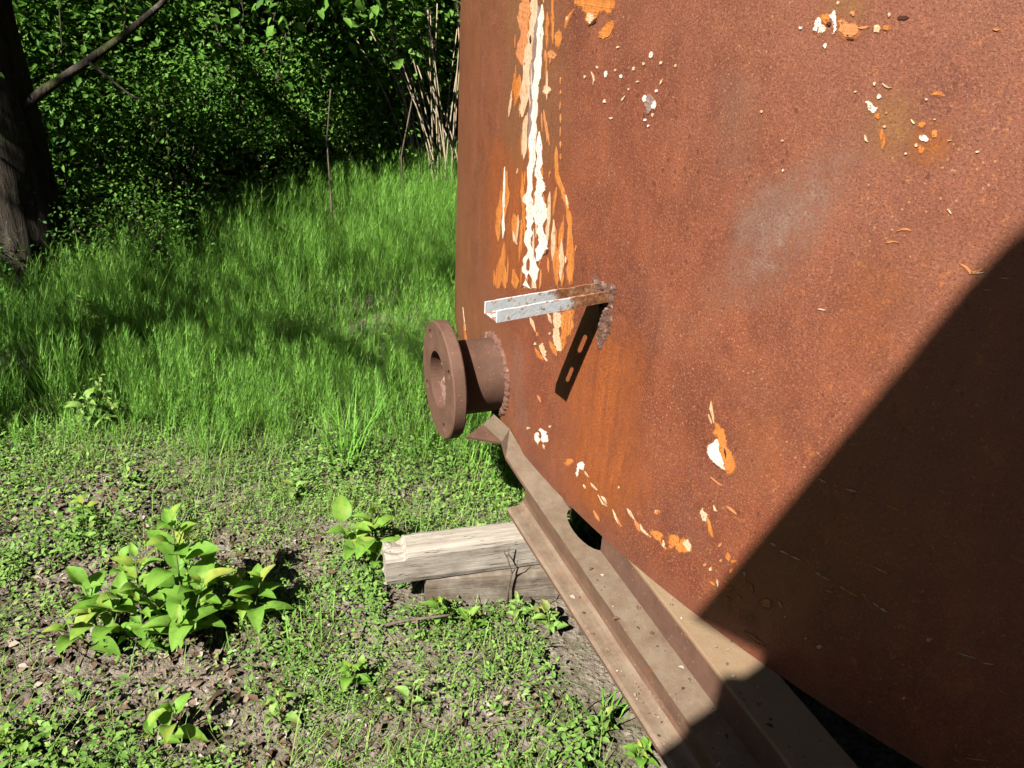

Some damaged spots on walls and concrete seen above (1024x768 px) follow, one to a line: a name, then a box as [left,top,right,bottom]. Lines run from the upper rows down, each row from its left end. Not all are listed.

peeling [798,1,909,49]
peeling [502,0,565,292]
rust [491,0,616,291]
peeling [583,51,677,102]
peeling [642,79,663,127]
peeling [864,82,892,150]
peeling [904,118,952,155]
peeling [529,309,575,362]
rust [565,330,635,527]
peeling [706,401,737,486]
peeling [575,462,651,537]
rust [634,519,691,552]